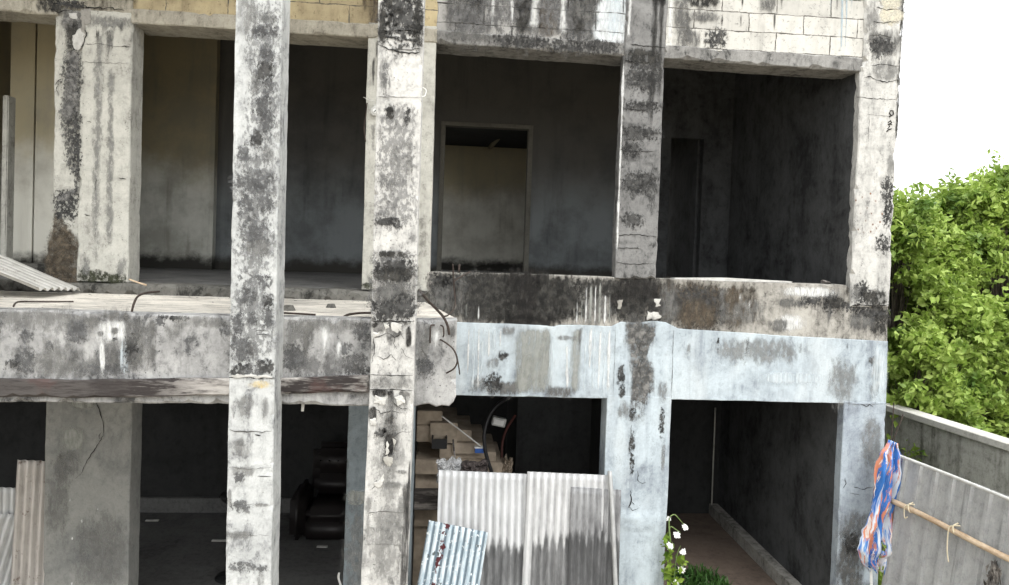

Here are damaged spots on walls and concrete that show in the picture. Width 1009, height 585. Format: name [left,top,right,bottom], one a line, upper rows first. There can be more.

water stain [58,49,84,195]
water stain [92,17,126,237]
water stain [232,0,277,255]
water stain [445,0,727,158]
mould [620,211,645,230]
mould [621,171,660,196]
water stain [762,0,776,28]
water stain [0,250,891,397]
crack [82,403,104,472]
spalling [369,390,409,489]